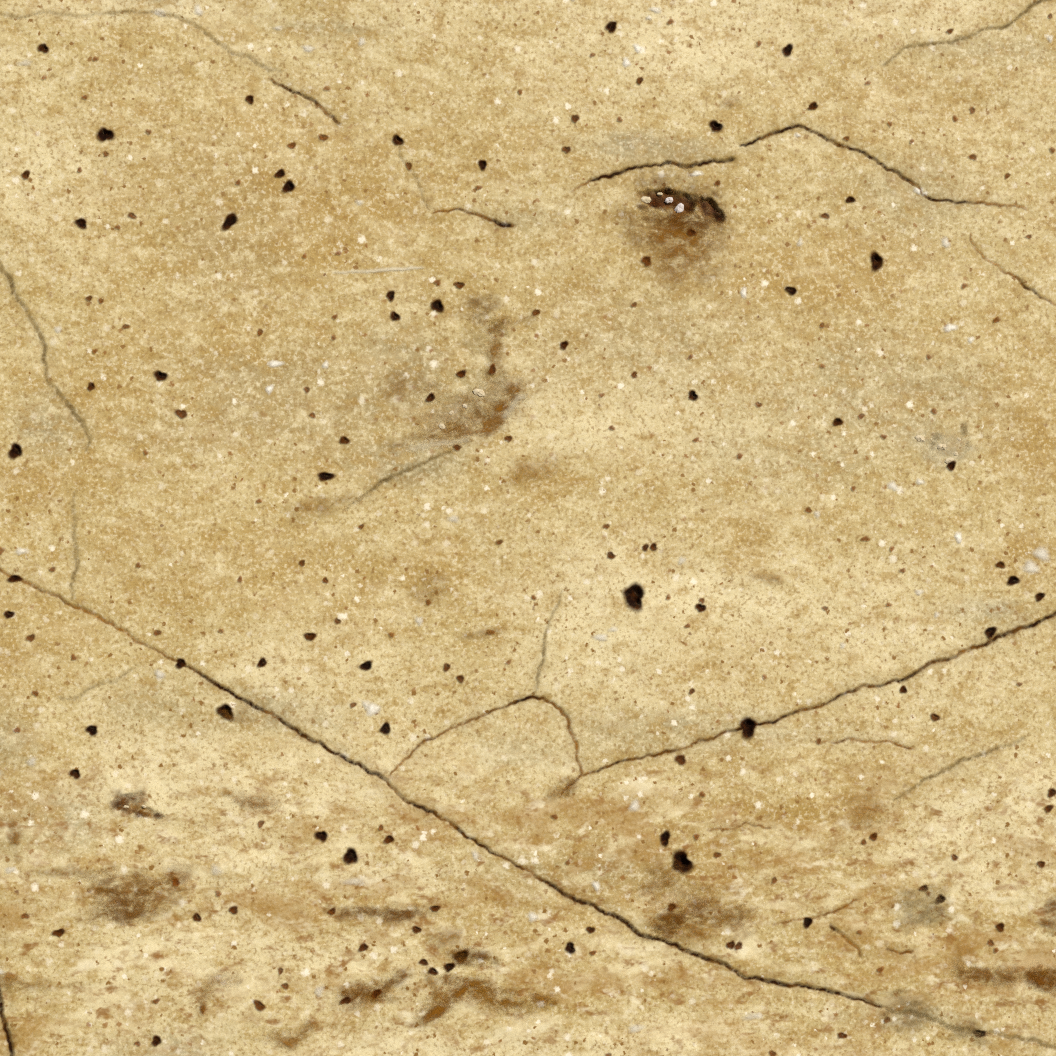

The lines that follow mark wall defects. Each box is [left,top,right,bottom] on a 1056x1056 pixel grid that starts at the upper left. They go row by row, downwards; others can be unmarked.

crack [887,0,1047,62]
crack [197,27,340,124]
crack [578,124,1026,209]
crack [435,208,514,227]
crack [970,237,1052,303]
crack [0,266,91,443]
crack [0,544,1056,1033]
crack [0,992,13,1056]
crack [999,1033,1056,1048]